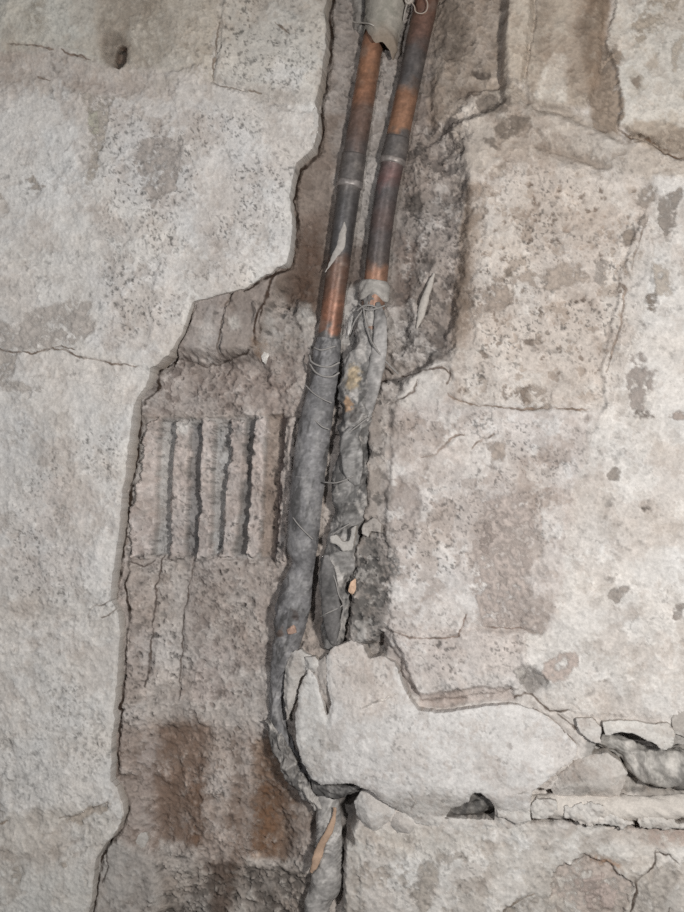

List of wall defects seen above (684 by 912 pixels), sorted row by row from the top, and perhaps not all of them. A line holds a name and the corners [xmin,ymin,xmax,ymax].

crack [624,133,681,159]
crack [0,345,83,358]
flaking render [575,711,684,750]
flaking render [67,783,129,833]
crack [630,852,678,912]